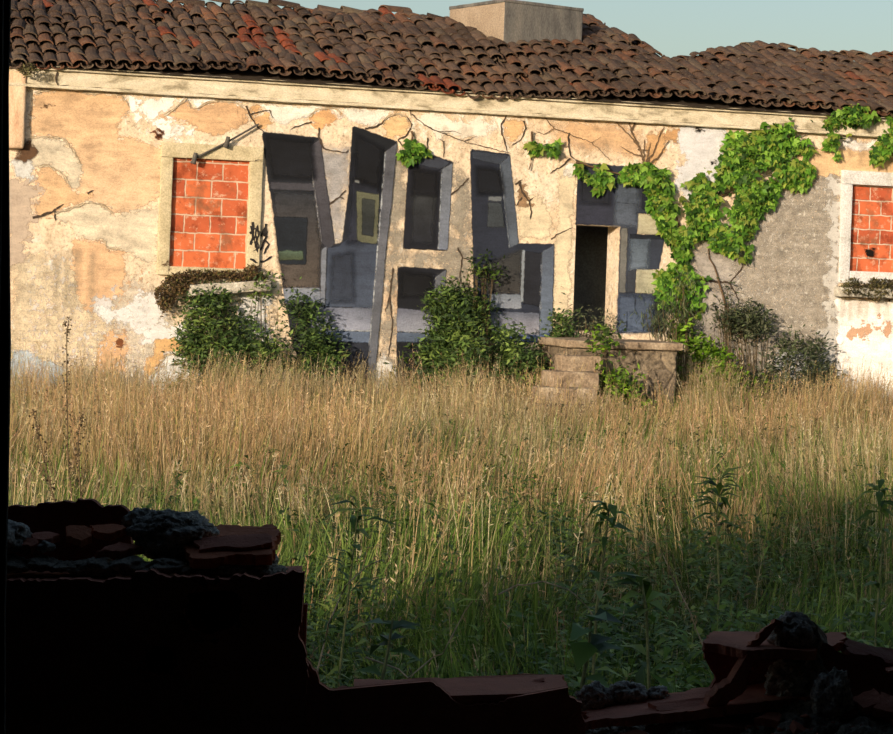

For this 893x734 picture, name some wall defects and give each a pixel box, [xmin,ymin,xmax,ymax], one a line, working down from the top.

crack [245,106,273,132]
crack [292,121,349,153]
crack [398,110,527,156]
crack [551,133,580,173]
crack [515,180,534,219]
peeling [9,89,527,397]
peeling [694,137,893,404]